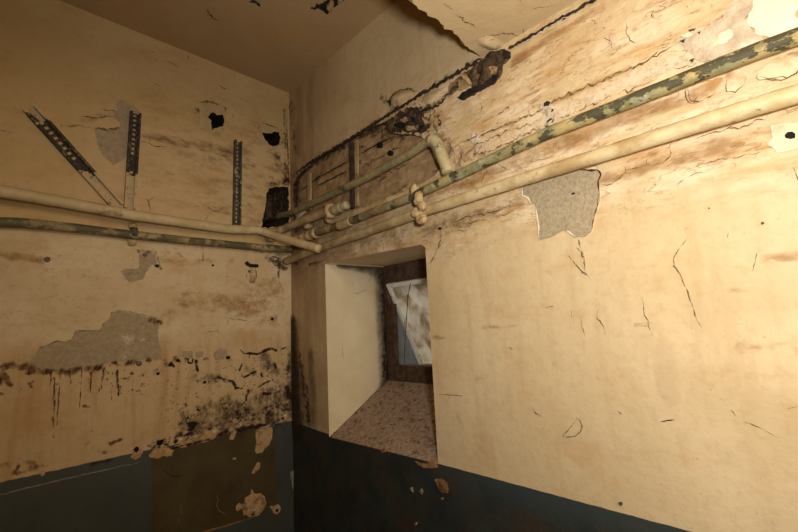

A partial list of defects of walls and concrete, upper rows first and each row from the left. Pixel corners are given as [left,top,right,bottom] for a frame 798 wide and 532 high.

peeling [311,0,344,14]
spalling [677,0,764,63]
peeling [83,99,143,166]
spalling [197,100,227,133]
damp [559,53,695,117]
spalling [259,104,485,233]
peeling [522,144,671,271]
crack [673,232,701,326]
peeling [26,309,163,374]
damp [149,317,310,449]
peeling [131,411,291,474]
peeling [236,489,281,517]